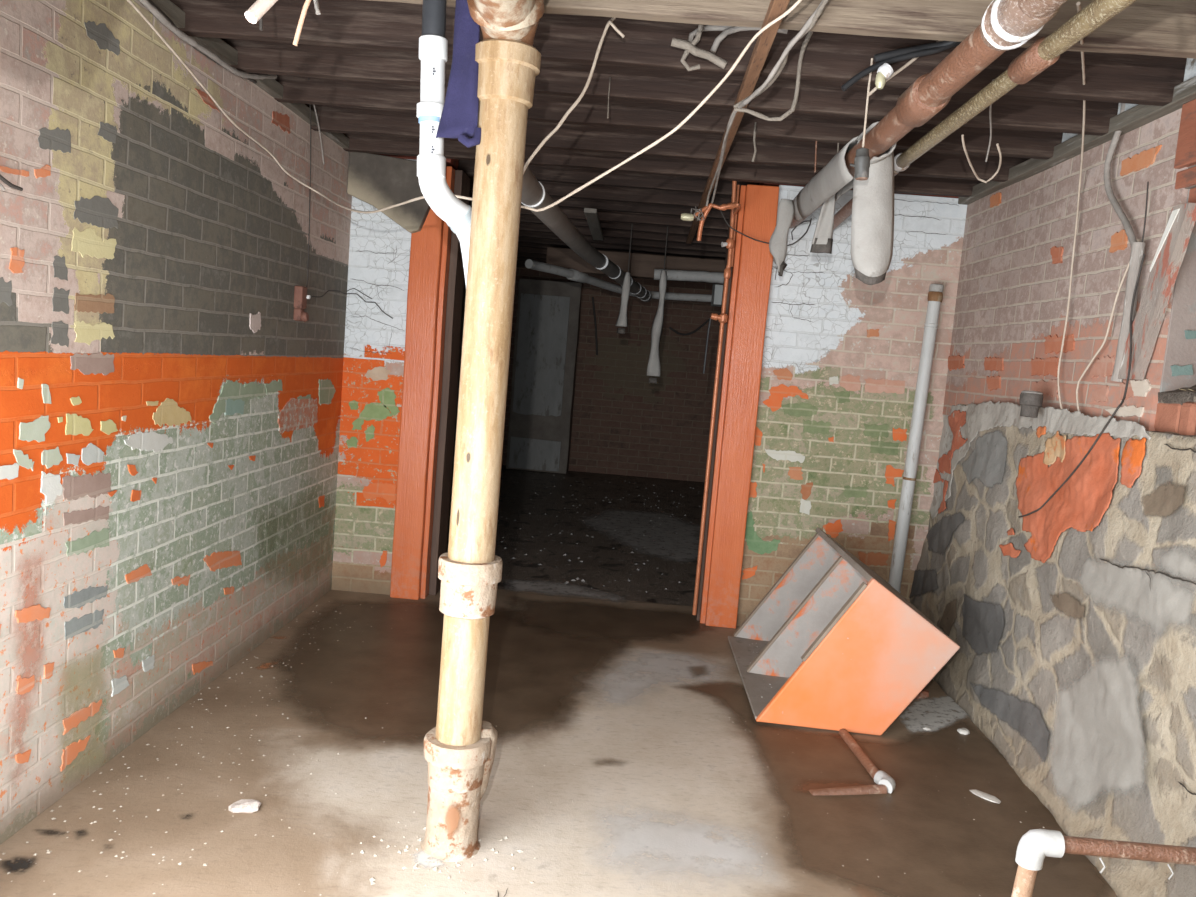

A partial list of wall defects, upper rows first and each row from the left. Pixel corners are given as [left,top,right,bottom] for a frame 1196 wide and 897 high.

peeling [0,127,71,178]
peeling [51,195,119,376]
flaking render [0,384,192,556]
peeling [209,378,336,433]
peeling [346,366,400,448]
peeling [742,427,813,580]
peeling [999,426,1146,563]
peeling [15,585,108,640]
damp [276,602,444,743]
damp [482,600,1067,897]
corrosion [445,806,460,834]
damp [1032,853,1108,897]